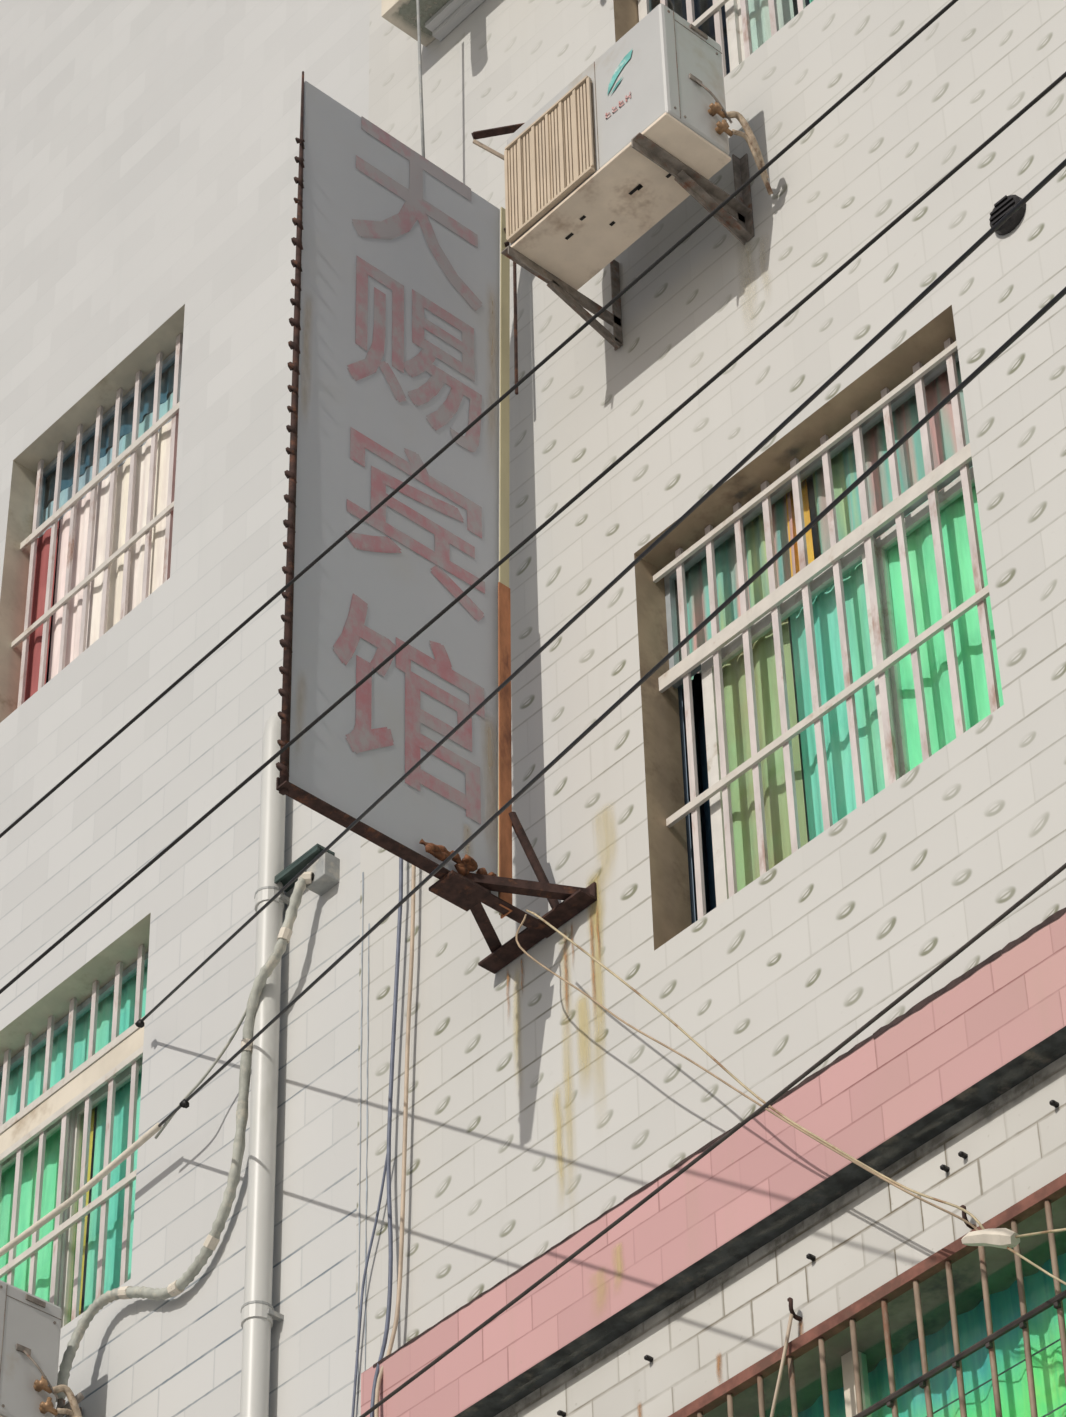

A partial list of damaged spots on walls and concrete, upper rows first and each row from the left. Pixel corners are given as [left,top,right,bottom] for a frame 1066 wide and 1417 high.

corrosion [564,904,601,1058]